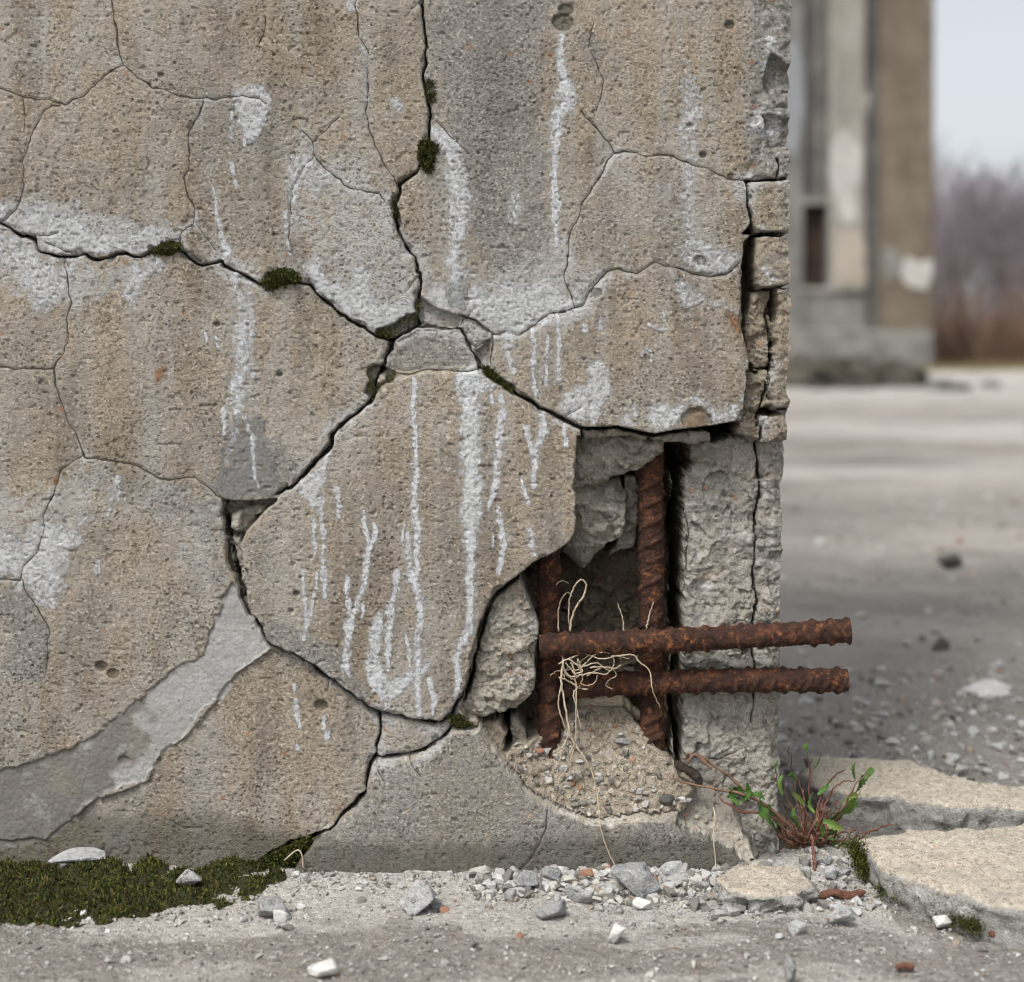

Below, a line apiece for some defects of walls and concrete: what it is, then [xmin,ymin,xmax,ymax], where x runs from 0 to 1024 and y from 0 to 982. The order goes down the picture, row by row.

crack [0,0,337,692]
water stain [296,446,344,642]
water stain [341,377,438,719]
crack [315,581,509,840]
water stain [283,126,613,448]
water stain [452,366,508,703]
spalling [462,560,539,756]
crack [279,0,786,494]
spalling [560,182,792,633]
spalling [664,646,781,671]
spalling [664,691,781,857]
crack [750,308,787,722]